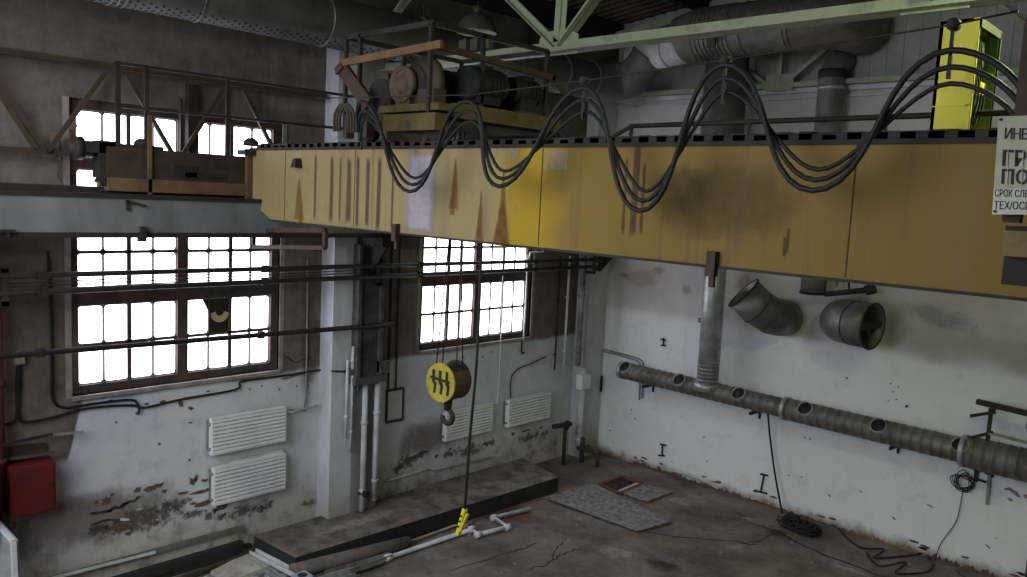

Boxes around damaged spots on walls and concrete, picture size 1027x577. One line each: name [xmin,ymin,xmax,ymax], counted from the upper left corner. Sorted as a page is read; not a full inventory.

peeling [134,473,228,514]
peeling [112,508,159,535]
crack [451,541,582,571]